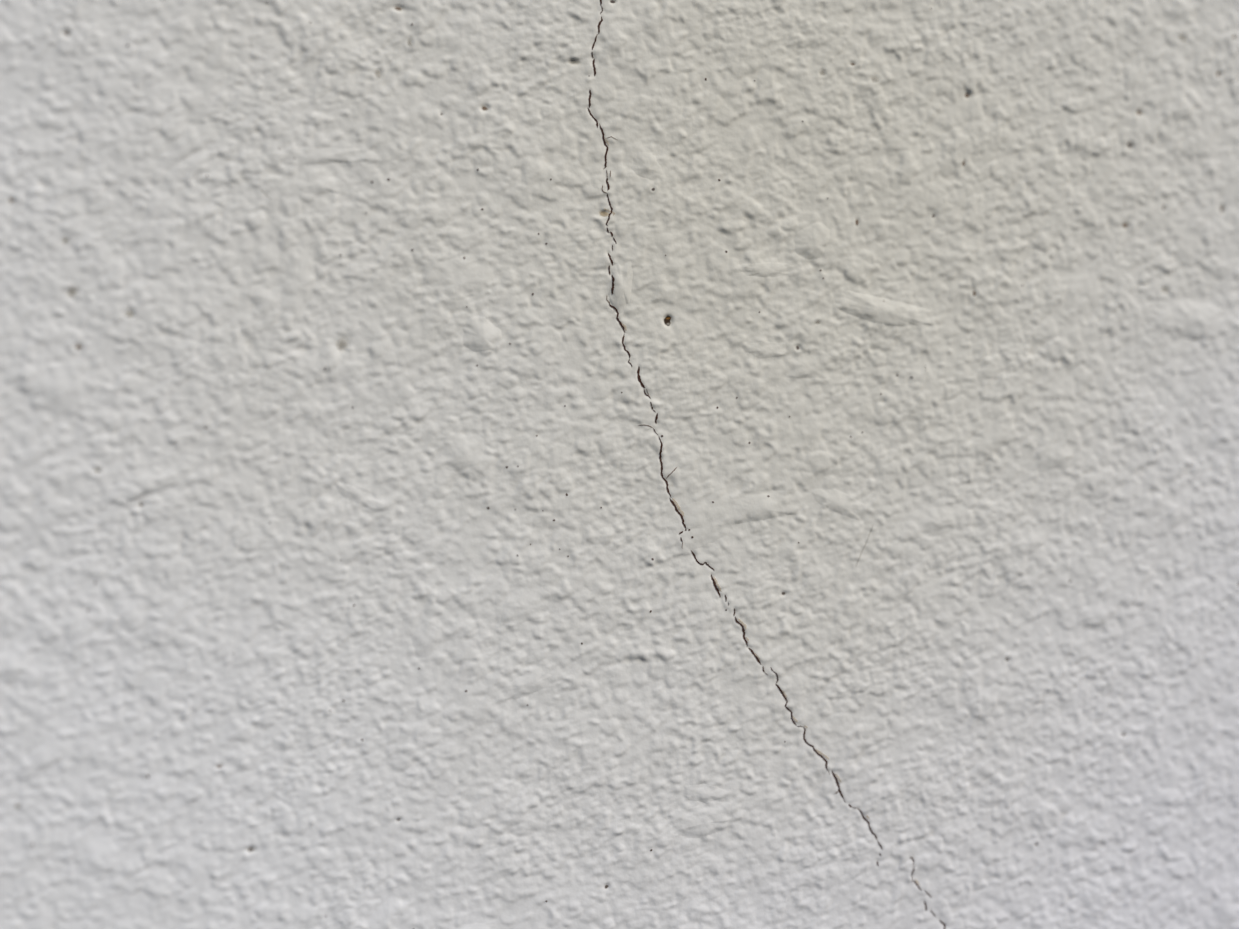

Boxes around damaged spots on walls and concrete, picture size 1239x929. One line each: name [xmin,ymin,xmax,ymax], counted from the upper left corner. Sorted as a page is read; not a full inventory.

crack [588,0,946,929]